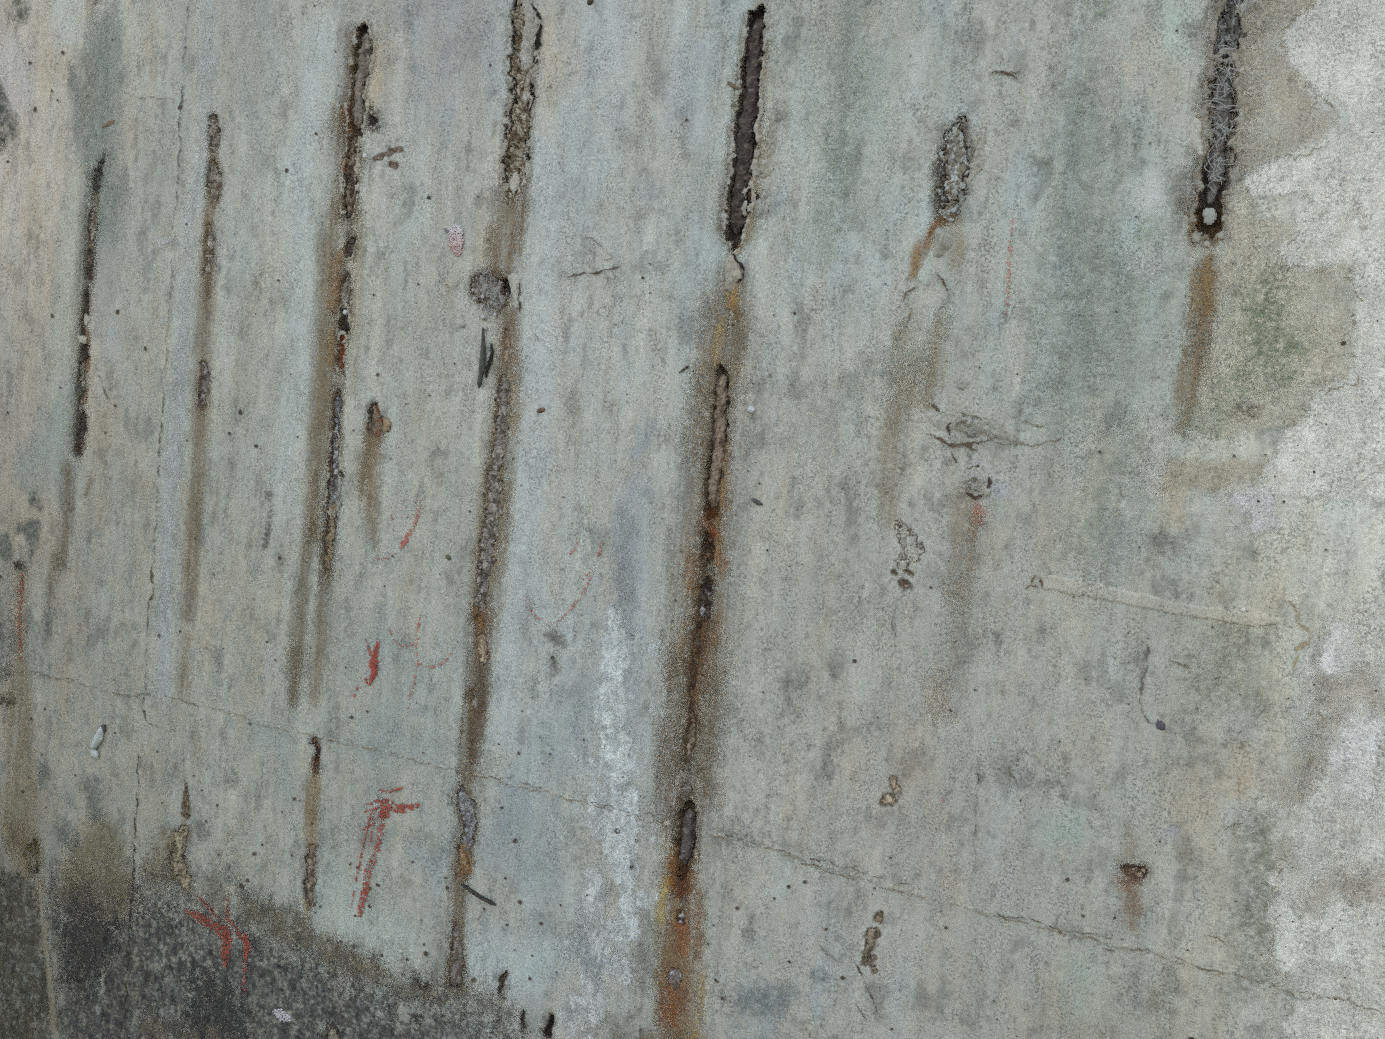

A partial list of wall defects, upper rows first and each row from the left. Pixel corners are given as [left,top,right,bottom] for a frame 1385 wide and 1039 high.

spalling [343,24,379,218]
spalling [502,0,536,205]
spalling [725,4,766,251]
crack [0,0,683,830]
spalling [469,271,521,312]
corrosion [1175,208,1232,429]
peeling [1193,0,1385,533]
corrosion [447,306,517,974]
corrosion [654,66,765,1039]
crack [123,751,142,1039]
water stain [0,861,523,1039]
crack [696,832,1385,1020]